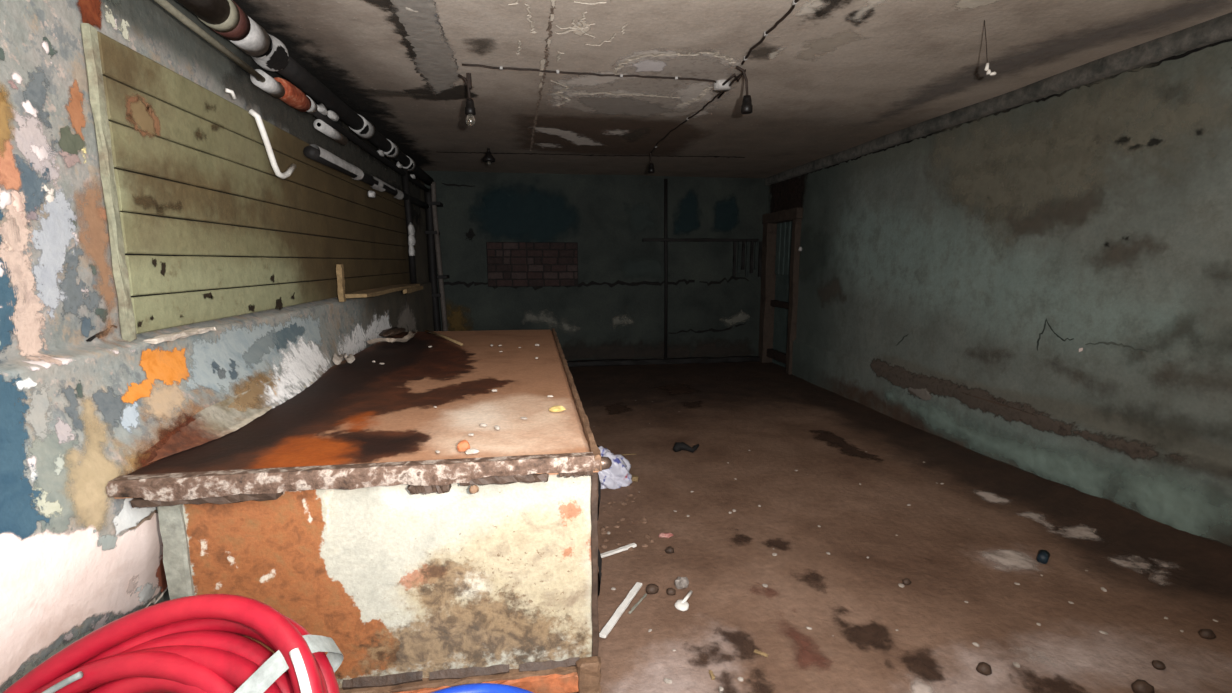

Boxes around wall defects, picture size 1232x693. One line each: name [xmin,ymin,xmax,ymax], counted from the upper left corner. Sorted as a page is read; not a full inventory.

peeling [105,5,130,41]
crack [443,0,745,158]
damp [813,0,874,26]
damp [892,0,1220,114]
damp [931,67,1232,242]
peeling [0,37,170,693]
peeling [136,313,355,467]
flaking render [367,331,417,344]
crack [444,276,749,290]
flaking render [870,358,1202,469]
crack [1037,319,1148,352]